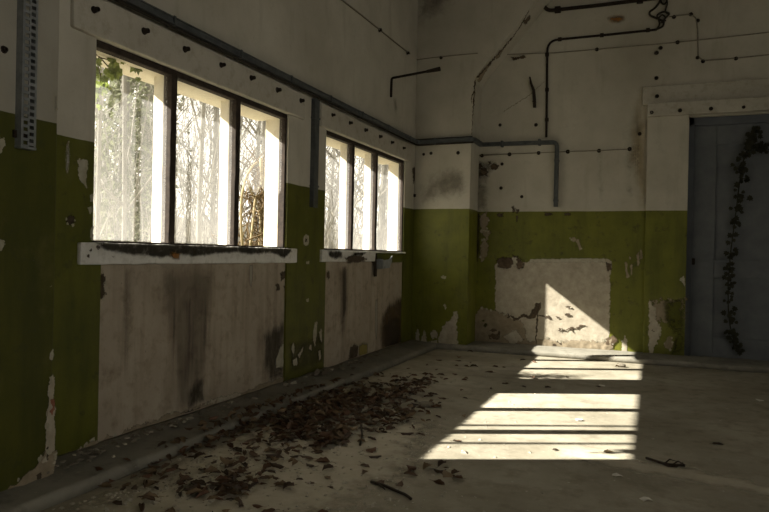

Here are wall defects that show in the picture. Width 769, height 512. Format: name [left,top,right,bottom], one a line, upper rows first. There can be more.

peeling [77,158,93,214]
spalling [478,161,499,177]
leakage [265,325,284,378]
peeling [276,321,322,368]
leakage [381,300,401,348]
peeling [415,304,458,344]
flaking render [475,248,628,351]
spalling [647,297,688,353]
spalling [7,375,57,490]